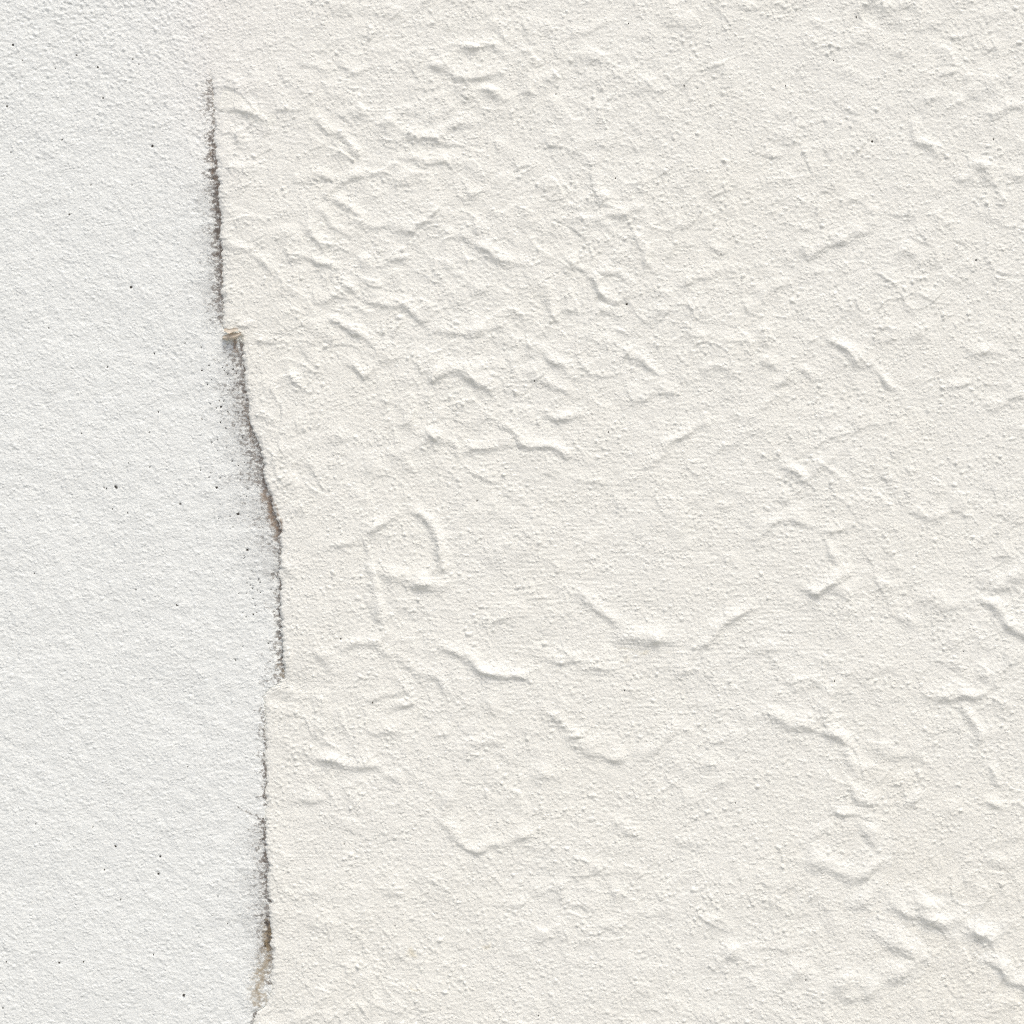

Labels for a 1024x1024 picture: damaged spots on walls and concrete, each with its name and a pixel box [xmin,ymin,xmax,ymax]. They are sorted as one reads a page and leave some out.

crack [208,129,223,295]
peeling [222,328,241,340]
crack [238,729,272,925]